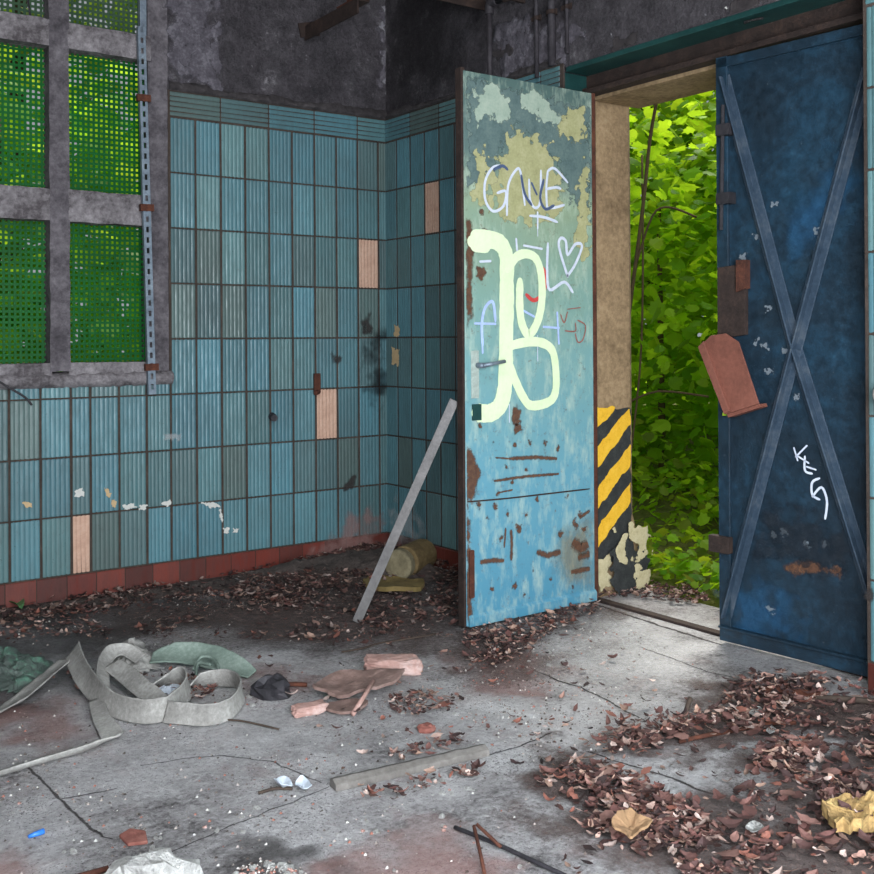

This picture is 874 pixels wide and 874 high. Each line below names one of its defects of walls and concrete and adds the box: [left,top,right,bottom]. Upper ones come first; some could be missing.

peeling [466,14,593,262]
spalling [104,488,148,510]
spalling [201,502,238,534]
corrosion [467,448,481,507]
corrosion [480,407,561,564]
corrosion [571,510,590,574]
peeling [598,521,653,596]
corrosion [785,561,841,575]
crack [490,732,552,755]
crack [28,767,116,839]
crack [140,755,328,852]